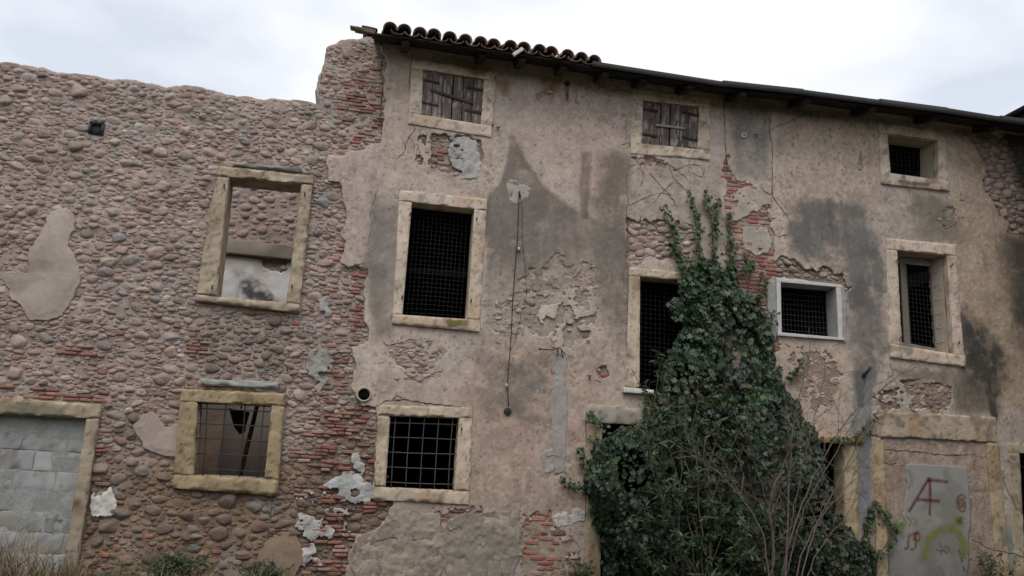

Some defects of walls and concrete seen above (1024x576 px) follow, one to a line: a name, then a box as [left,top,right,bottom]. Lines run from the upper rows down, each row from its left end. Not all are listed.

flaking render [415,131,484,175]
peeling [486,253,599,349]
leakage [485,146,628,322]
flaking render [626,216,700,265]
crack [621,98,727,352]
flaking render [720,155,850,359]
crack [761,110,815,237]
leakage [789,199,886,527]
flaking render [874,379,952,416]
flaking render [971,133,1024,236]
peeling [257,452,373,576]
flaking render [517,510,585,576]